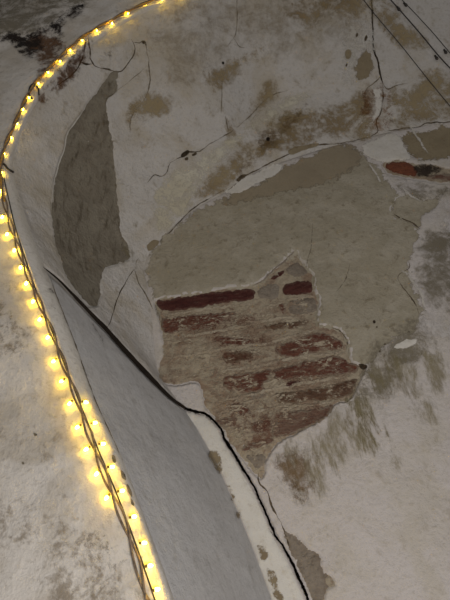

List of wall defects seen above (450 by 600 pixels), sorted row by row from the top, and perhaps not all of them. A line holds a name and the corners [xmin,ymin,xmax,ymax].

leakage [0,4,83,42]
flaking render [51,71,130,306]
crack [56,39,151,130]
leakage [129,93,170,116]
leakage [200,93,372,197]
crack [147,0,450,251]
leakage [392,69,450,127]
peeling [145,124,450,478]
leakage [355,319,450,420]
crack [43,258,309,600]
leakage [278,416,376,490]
spalling [284,531,335,600]